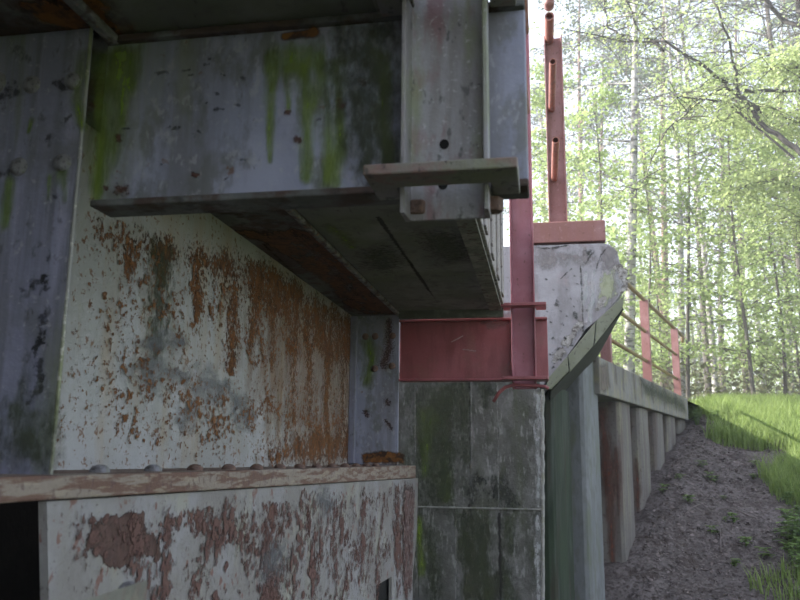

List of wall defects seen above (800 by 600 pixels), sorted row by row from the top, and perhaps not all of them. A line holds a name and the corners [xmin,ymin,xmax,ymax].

corrosion [9,0,97,38]
damp [300,23,401,185]
corrosion [93,217,351,467]
peeling [72,481,413,600]
corrosion [362,451,405,464]
damp [454,444,520,600]